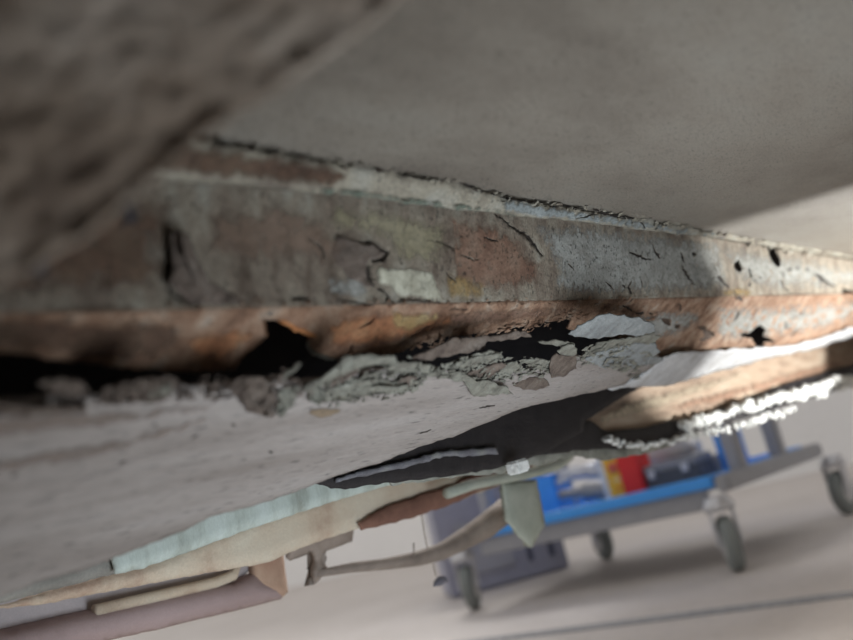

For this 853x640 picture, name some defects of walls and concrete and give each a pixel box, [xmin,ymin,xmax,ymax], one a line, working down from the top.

hole [737,241,782,267]
peeling [377,268,441,301]
hole [741,325,772,346]
spalling [0,313,664,418]